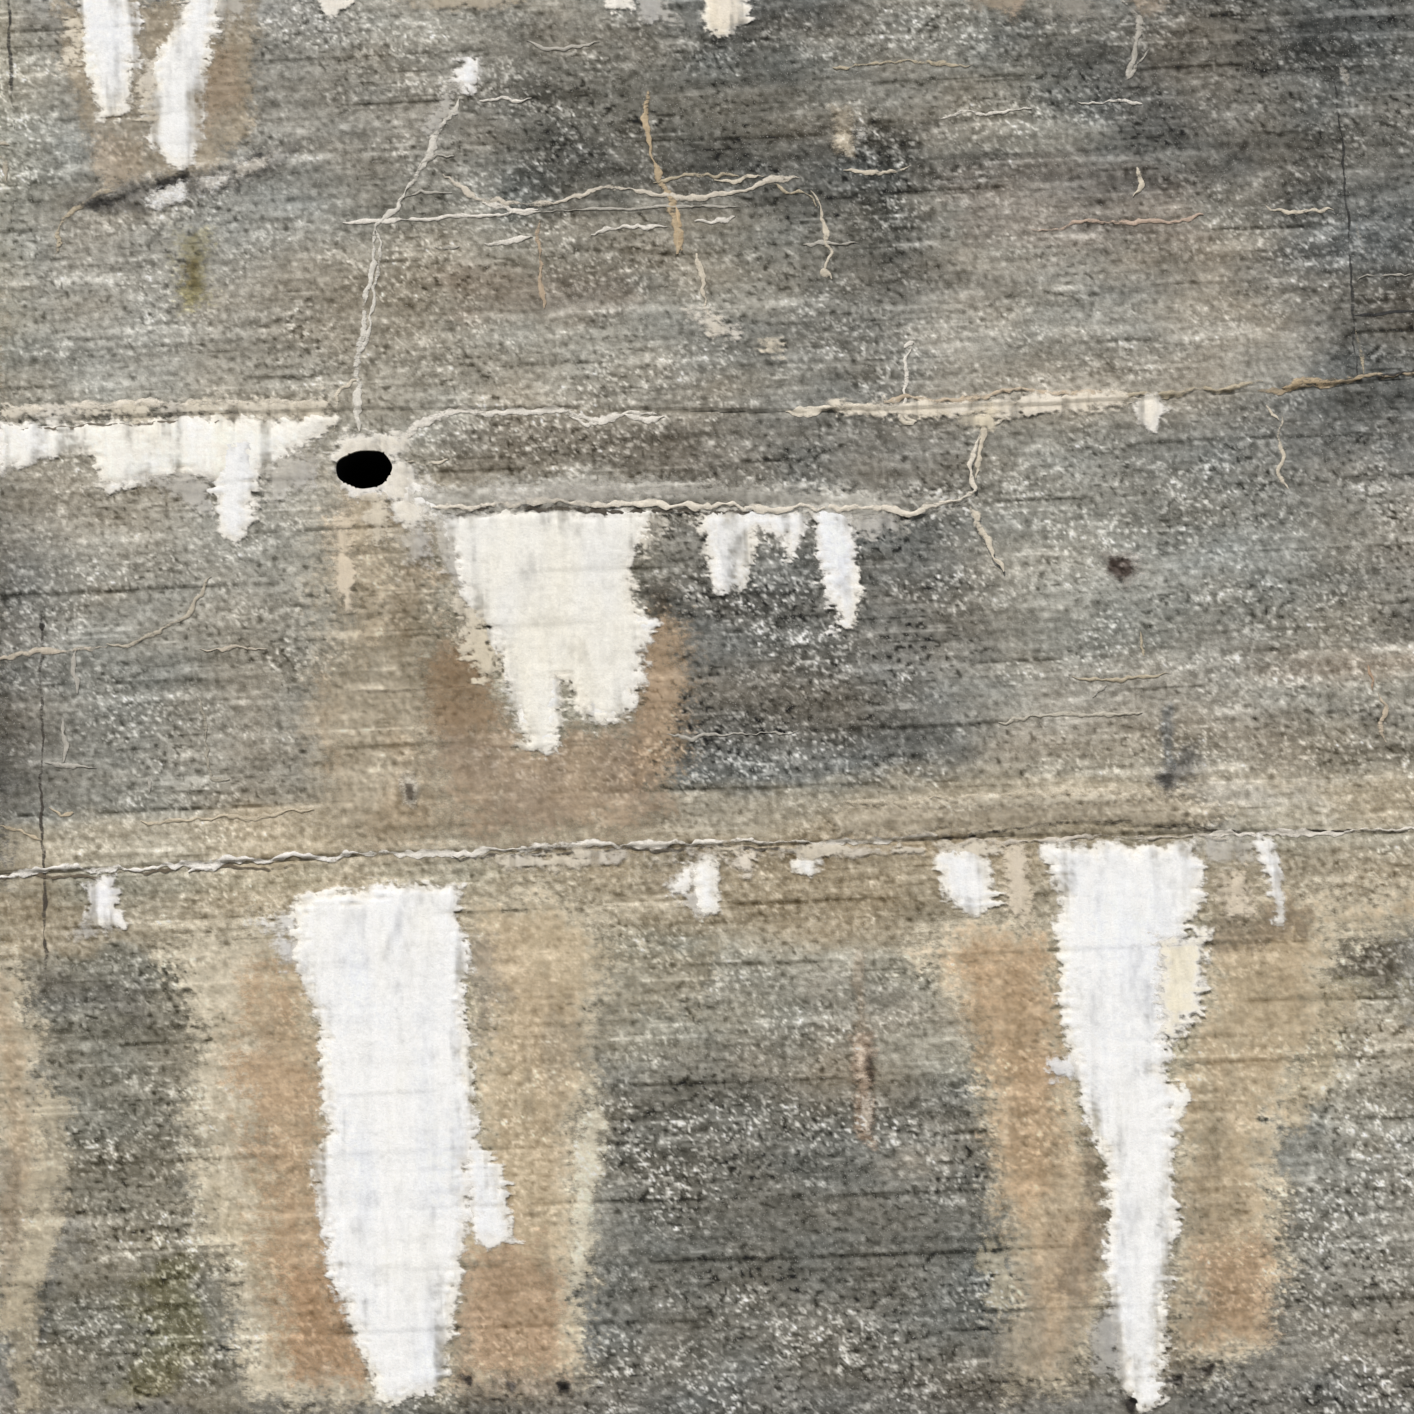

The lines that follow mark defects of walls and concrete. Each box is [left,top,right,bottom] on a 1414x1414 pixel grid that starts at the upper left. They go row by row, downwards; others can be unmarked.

crack [6,3,14,89]
damp [54,0,243,171]
crack [526,40,599,51]
damp [701,0,755,38]
crack [833,59,972,70]
crack [1078,0,1147,105]
crack [0,91,858,432]
crack [398,67,1414,572]
damp [0,387,693,755]
damp [691,502,894,637]
efflorescence [248,880,524,1408]
efflorescence [650,832,1285,1413]